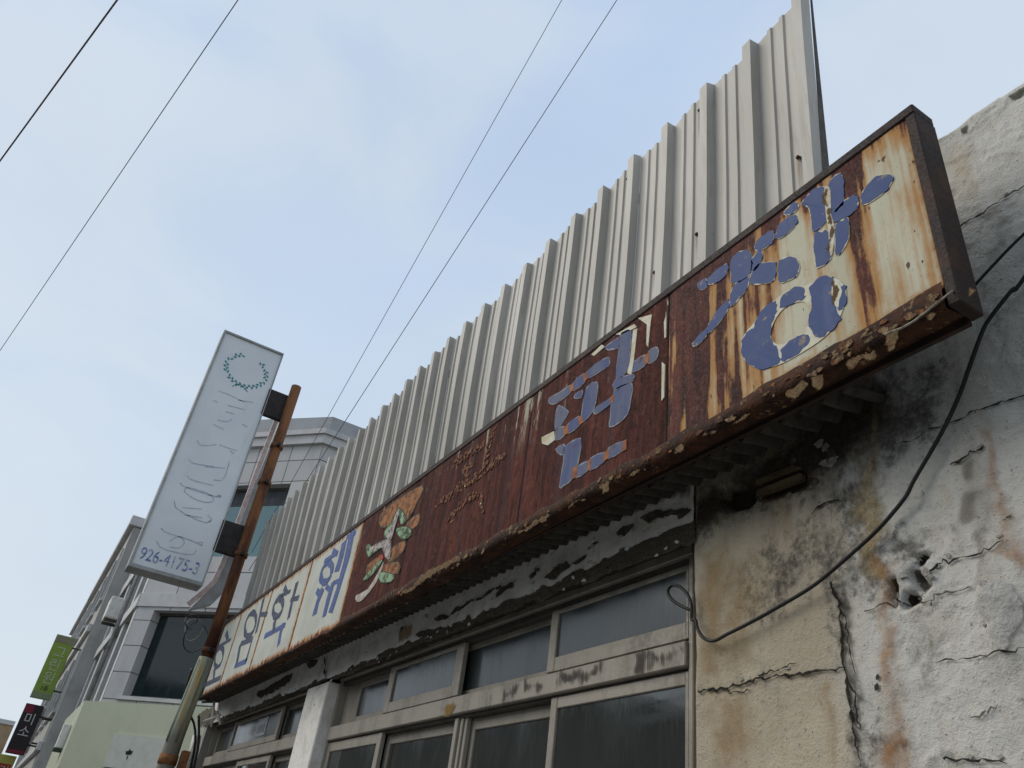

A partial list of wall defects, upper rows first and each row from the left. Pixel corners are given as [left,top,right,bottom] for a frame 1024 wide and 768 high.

crack [898,395,1024,444]
spalling [814,439,839,468]
crack [950,444,984,465]
spalling [856,457,935,608]
peeling [197,508,697,727]
crack [698,534,1007,767]
crack [935,647,1024,663]